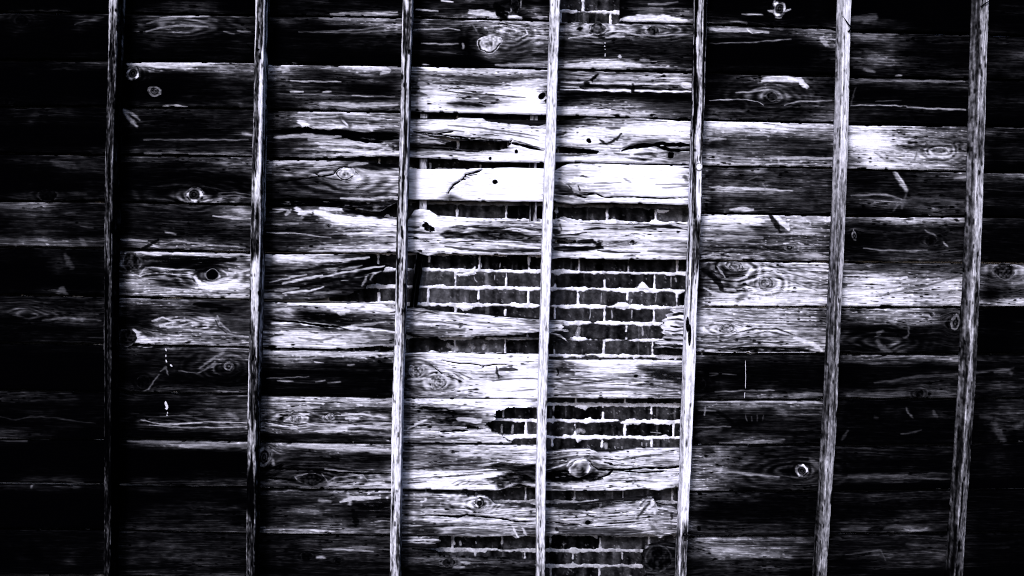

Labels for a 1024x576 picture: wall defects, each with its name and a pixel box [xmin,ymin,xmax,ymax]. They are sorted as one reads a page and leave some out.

crack [268,126,544,194]